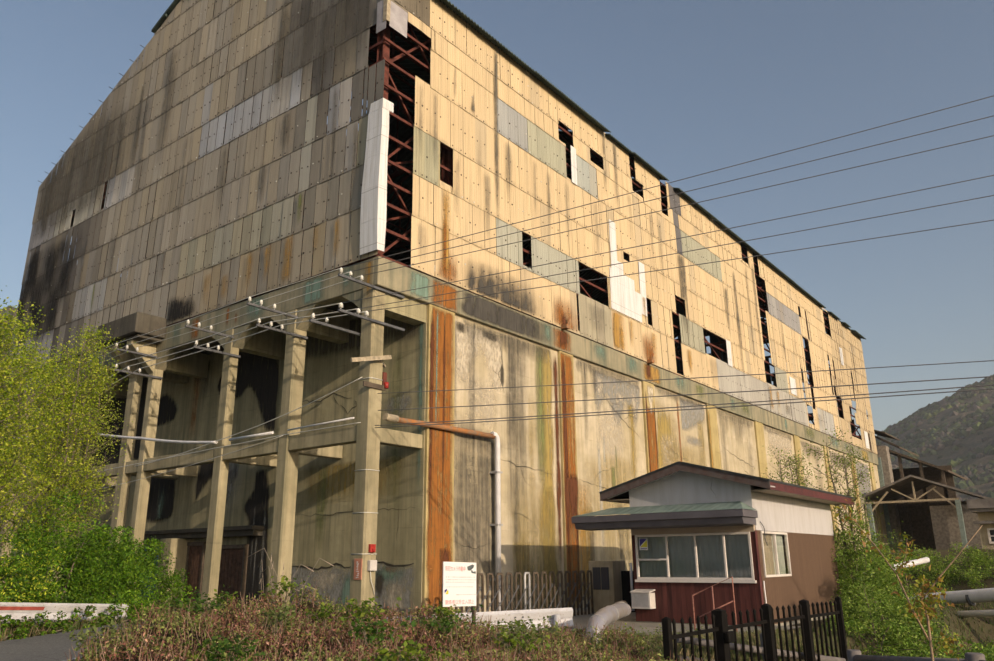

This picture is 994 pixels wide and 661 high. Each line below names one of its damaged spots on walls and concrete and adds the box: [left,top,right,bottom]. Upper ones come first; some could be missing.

leakage [18,240,70,343]
leakage [167,299,193,336]
leakage [462,270,549,454]
corrosion [614,312,632,349]
corrosion [644,338,660,383]
corrosion [427,197,456,612]
corrosion [537,303,591,603]
corrosion [646,399,682,472]
peeling [290,567,351,610]
peeling [374,564,414,617]